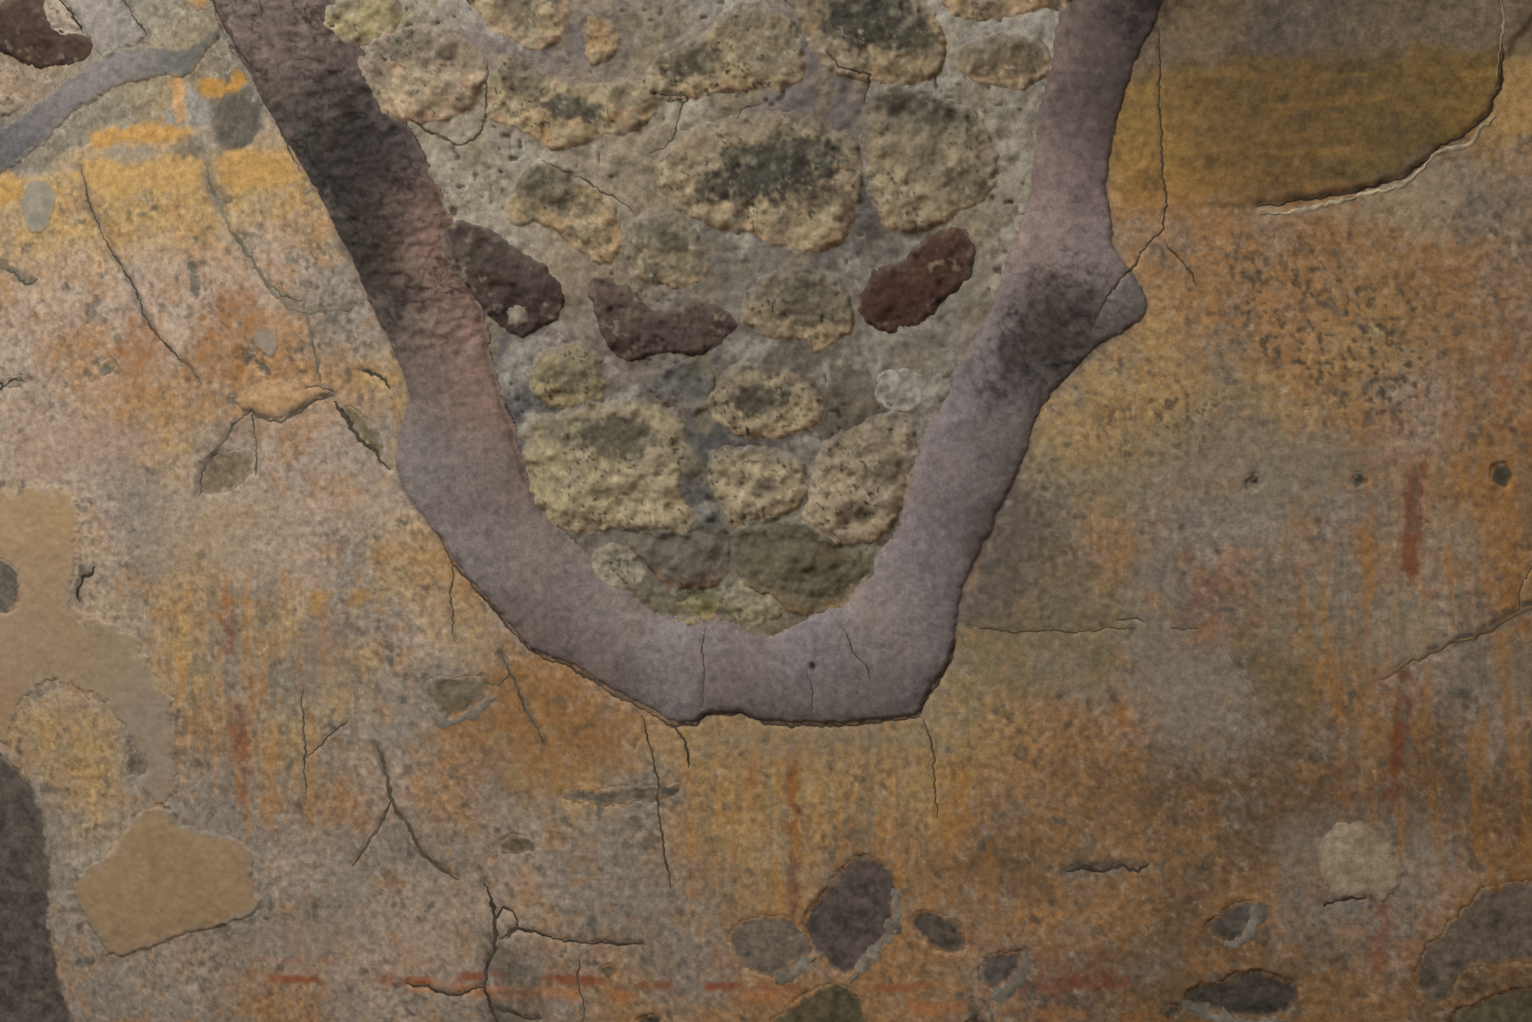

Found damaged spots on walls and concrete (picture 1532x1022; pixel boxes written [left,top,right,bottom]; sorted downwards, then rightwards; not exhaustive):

crack [0,378,25,390]
crack [81,169,202,385]
crack [300,684,348,791]
crack [352,746,645,1022]